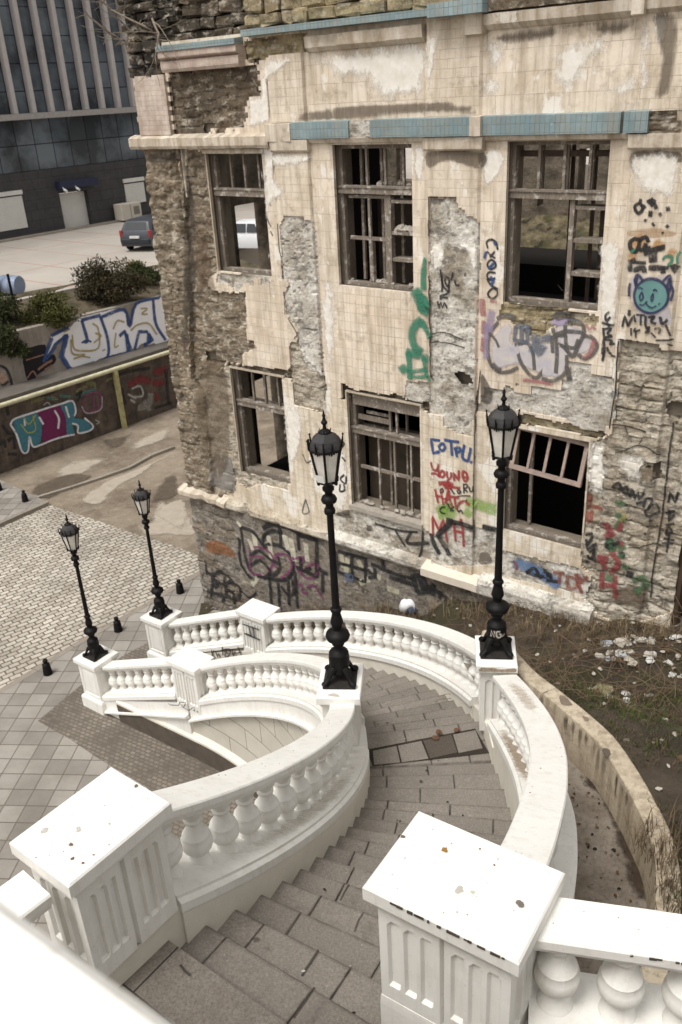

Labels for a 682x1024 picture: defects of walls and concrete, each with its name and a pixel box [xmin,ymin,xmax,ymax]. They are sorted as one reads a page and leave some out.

spalling [117,0,307,134]
water stain [301,102,470,120]
water stain [656,14,676,95]
spalling [186,149,327,497]
spalling [333,196,682,621]